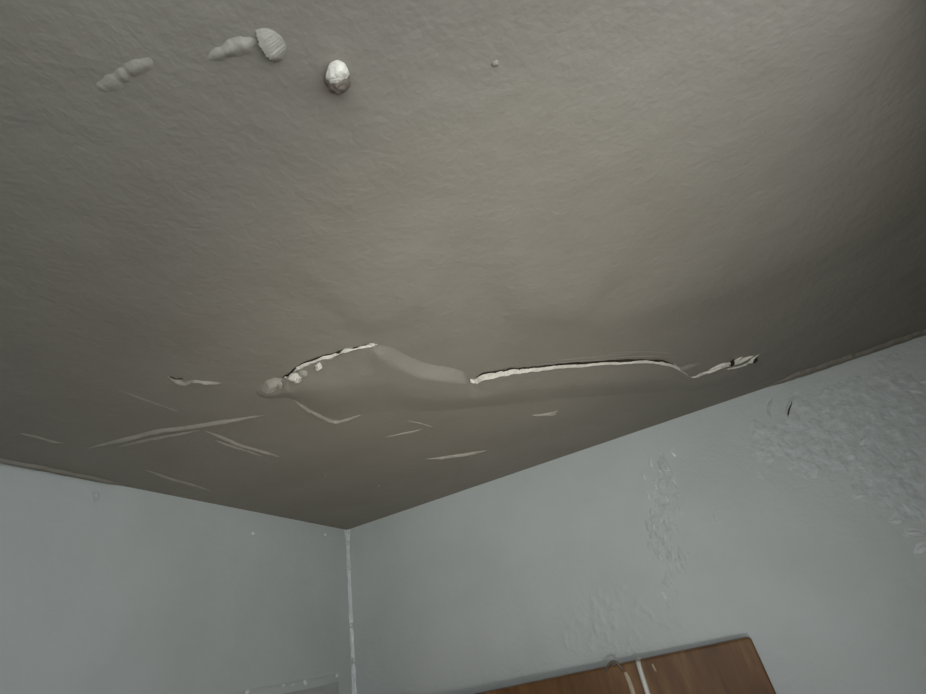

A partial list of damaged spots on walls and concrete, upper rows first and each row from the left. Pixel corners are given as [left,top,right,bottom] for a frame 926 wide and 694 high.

spalling [326,60,349,84]
crack [262,343,379,394]
crack [470,351,758,384]